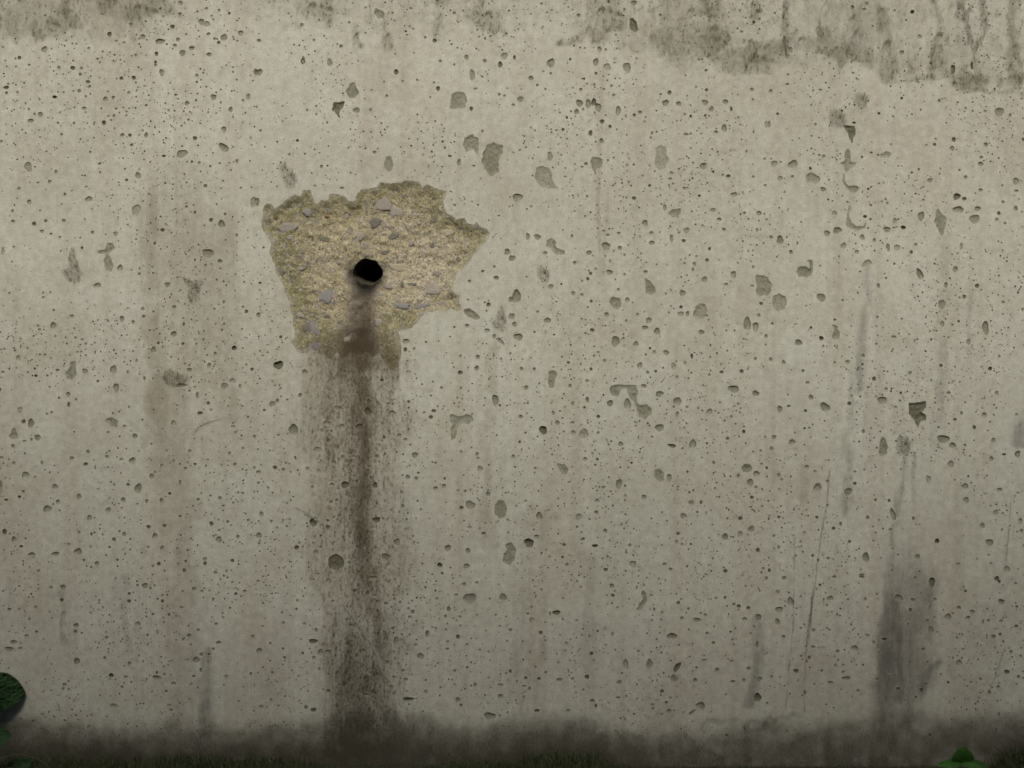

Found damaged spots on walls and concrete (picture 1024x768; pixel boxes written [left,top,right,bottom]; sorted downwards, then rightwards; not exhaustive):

damp [743,3,800,70]
spalling [250,156,523,370]
damp [0,301,1024,767]